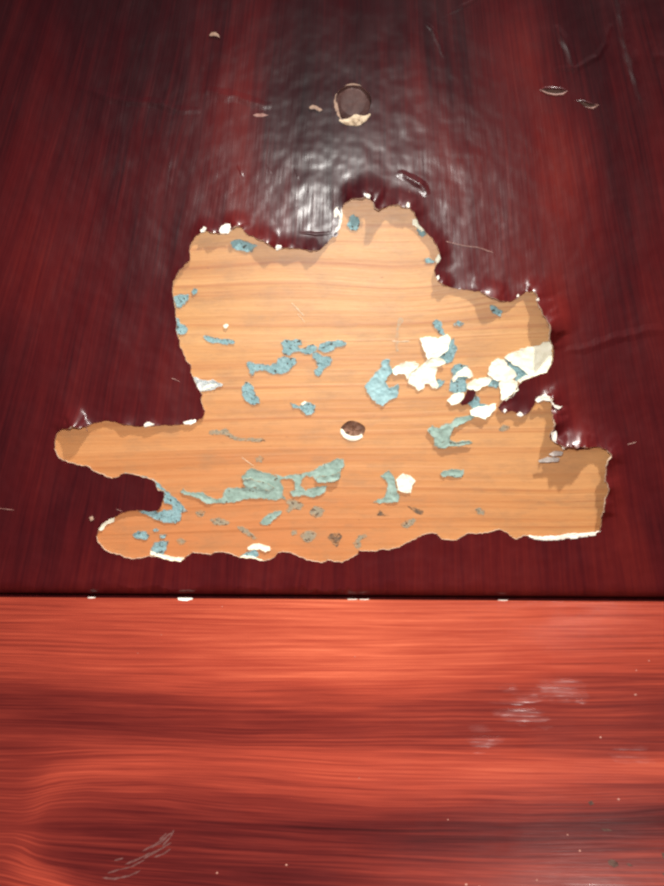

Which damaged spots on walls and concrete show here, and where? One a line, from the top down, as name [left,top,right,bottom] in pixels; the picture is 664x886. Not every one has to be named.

peeling [23,162,641,601]